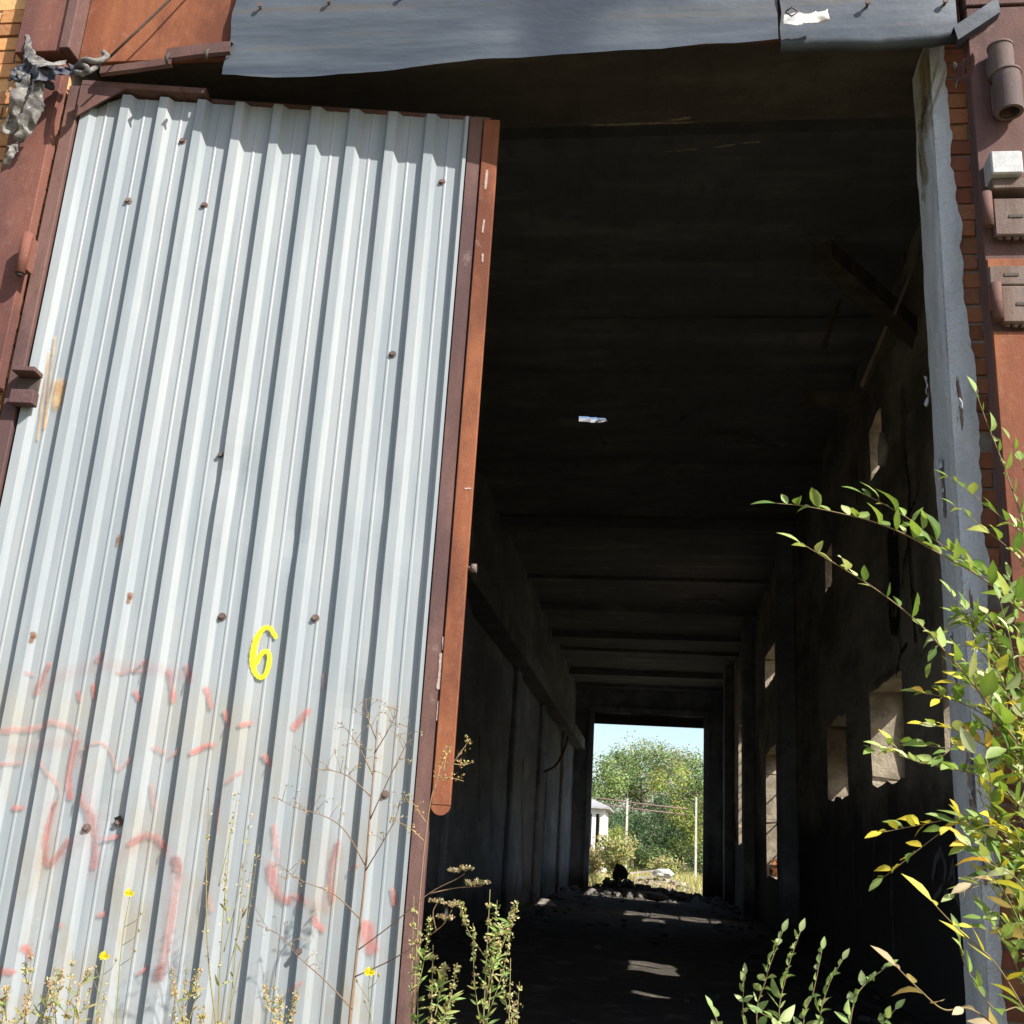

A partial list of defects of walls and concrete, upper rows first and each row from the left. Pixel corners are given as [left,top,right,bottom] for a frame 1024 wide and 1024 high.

damp [918,51,945,201]
corrosion [37,337,64,440]